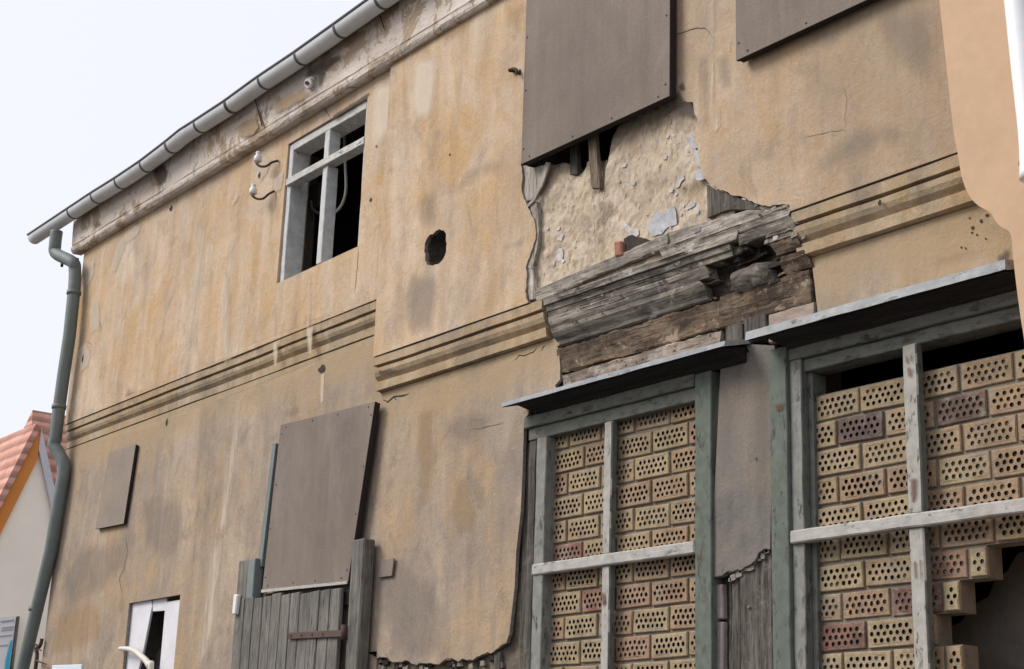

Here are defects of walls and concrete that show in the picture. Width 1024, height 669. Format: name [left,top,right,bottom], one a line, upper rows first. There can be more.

flaking render [523,99,735,302]
flaking render [374,572,522,669]
flaking render [717,549,773,669]